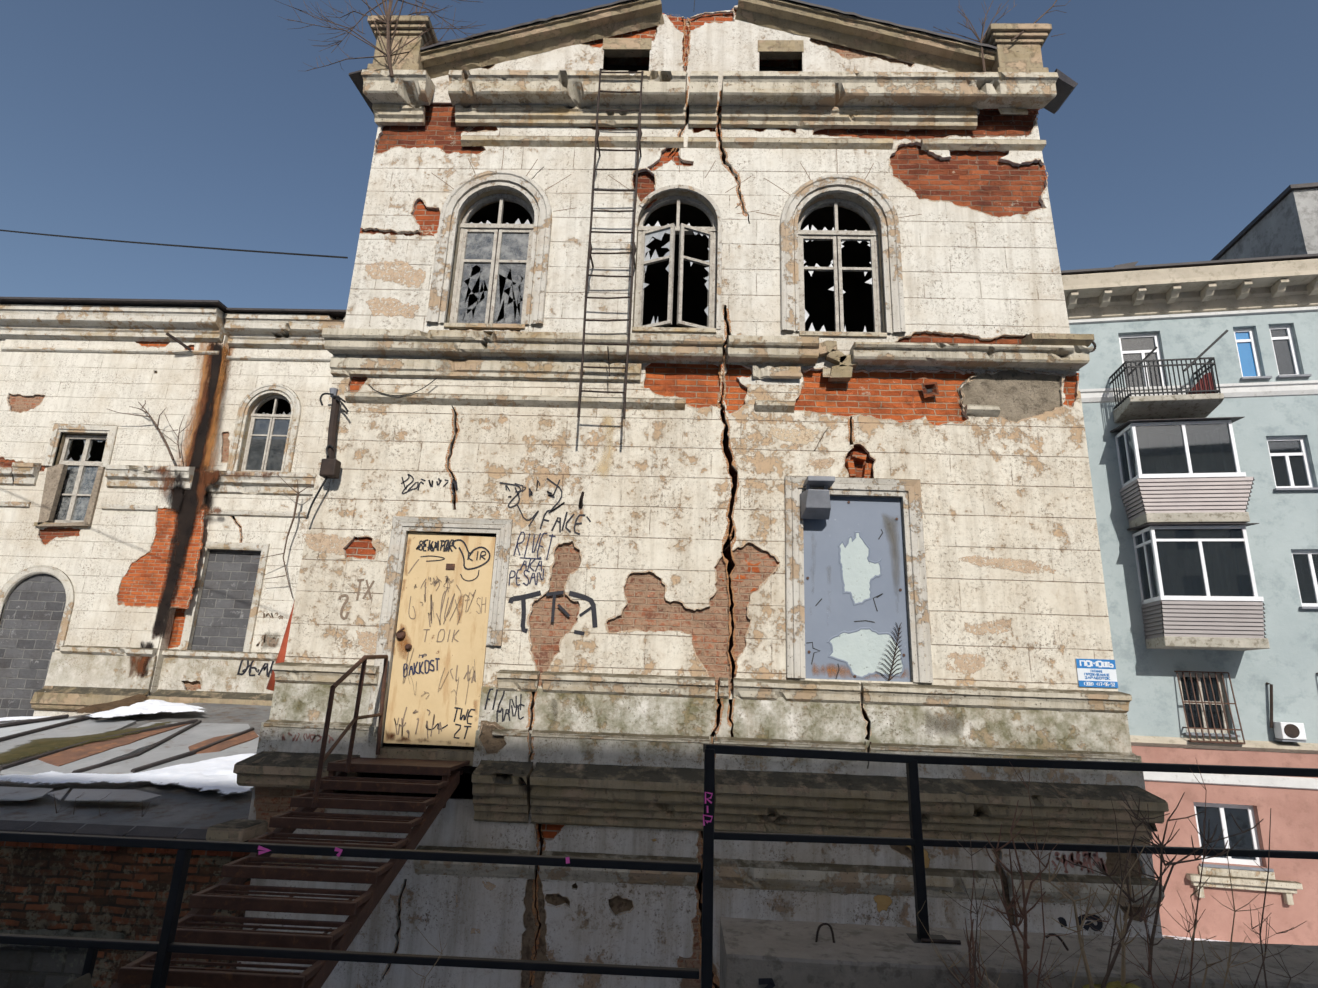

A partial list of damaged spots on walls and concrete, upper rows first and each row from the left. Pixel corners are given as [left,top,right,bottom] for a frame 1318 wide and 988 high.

flaking render [374,104,498,155]
crack [668,18,749,222]
flaking render [740,109,1048,218]
corrosion [151,342,231,497]
crack [445,407,460,510]
flaking render [794,367,1079,433]
flaking render [116,507,204,649]
flaking render [527,541,596,687]
flaking render [605,541,780,693]
crack [711,308,739,758]
crack [526,692,537,762]
crack [529,824,546,986]